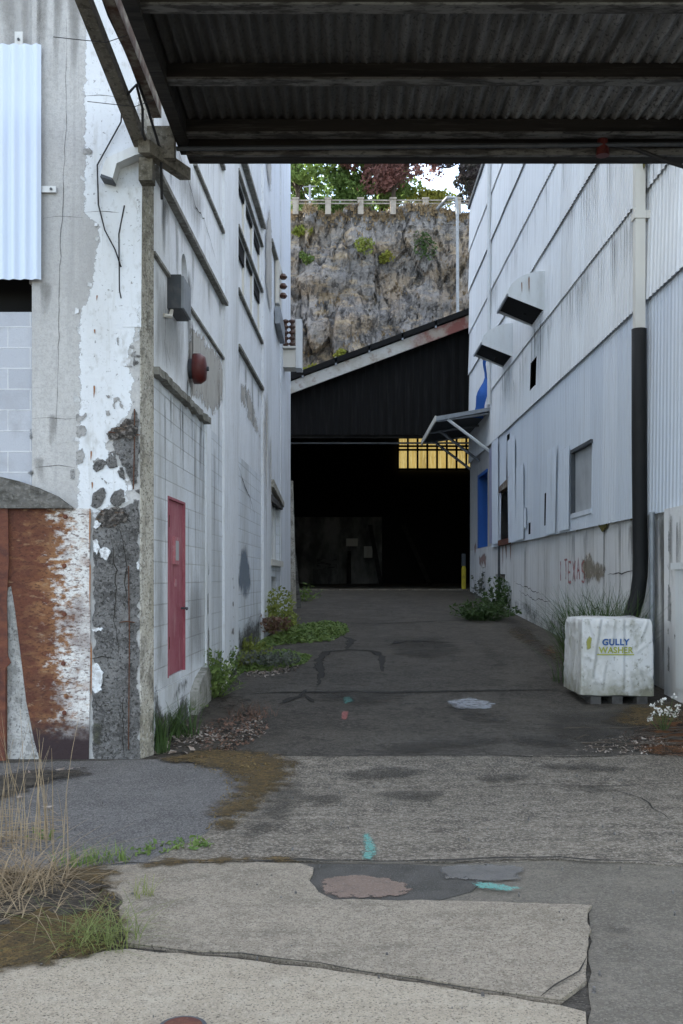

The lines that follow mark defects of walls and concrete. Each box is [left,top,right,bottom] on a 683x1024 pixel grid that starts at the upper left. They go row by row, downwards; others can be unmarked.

crack [48,40,119,284]
crack [48,317,61,419]
peeling [117,308,140,367]
spalling [70,395,140,759]
leakage [582,554,605,583]